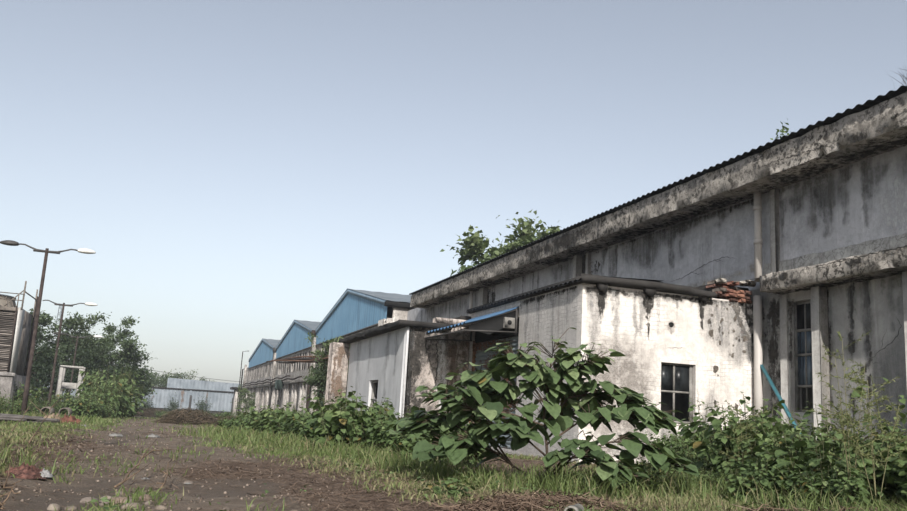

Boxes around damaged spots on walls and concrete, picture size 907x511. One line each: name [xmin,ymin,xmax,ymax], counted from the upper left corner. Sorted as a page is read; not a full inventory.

leakage [762,113,907,229]
leakage [405,194,905,416]